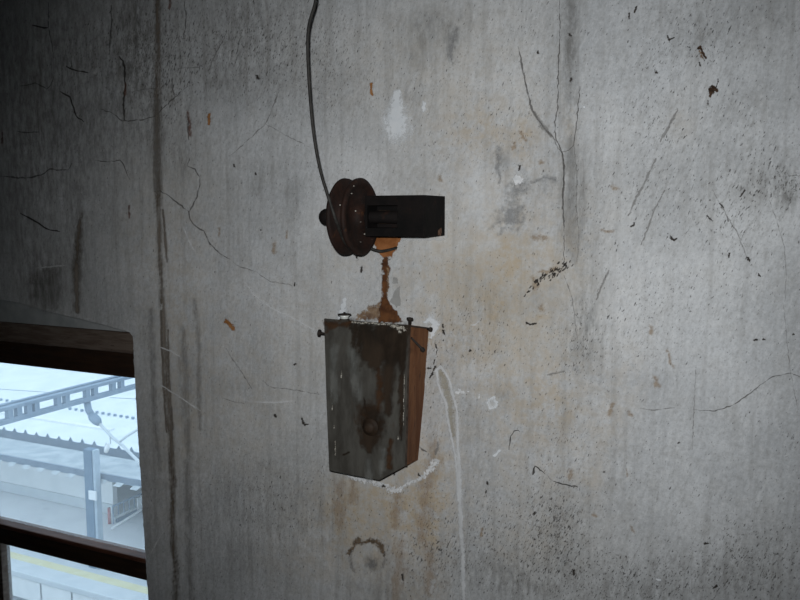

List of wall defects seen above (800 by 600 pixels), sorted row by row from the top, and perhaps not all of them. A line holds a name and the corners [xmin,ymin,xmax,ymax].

crack [23,62,88,122]
crack [518,0,580,261]
crack [20,213,60,232]
crack [155,158,229,259]
water stain [153,0,178,600]
rust [356,236,402,324]
spalling [524,260,573,297]
crack [700,373,800,411]
water stain [346,537,385,556]